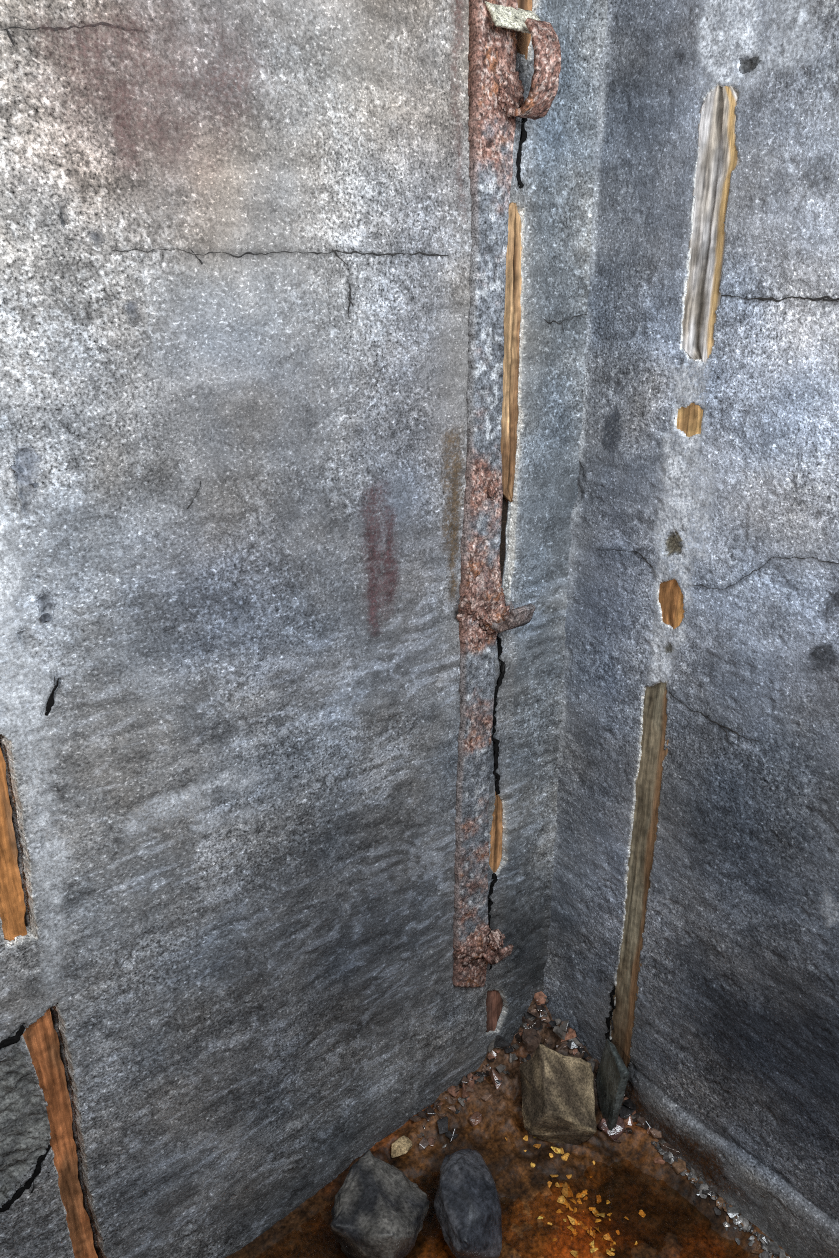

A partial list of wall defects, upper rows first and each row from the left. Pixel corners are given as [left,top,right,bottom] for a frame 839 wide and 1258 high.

crack [115,249,448,317]
crack [721,294,839,302]
corrosion [365,488,395,631]
crack [491,636,505,795]
crack [488,873,498,934]
crack [0,1025,25,1050]
corrosion [624,1083,745,1195]
crack [0,1145,51,1213]